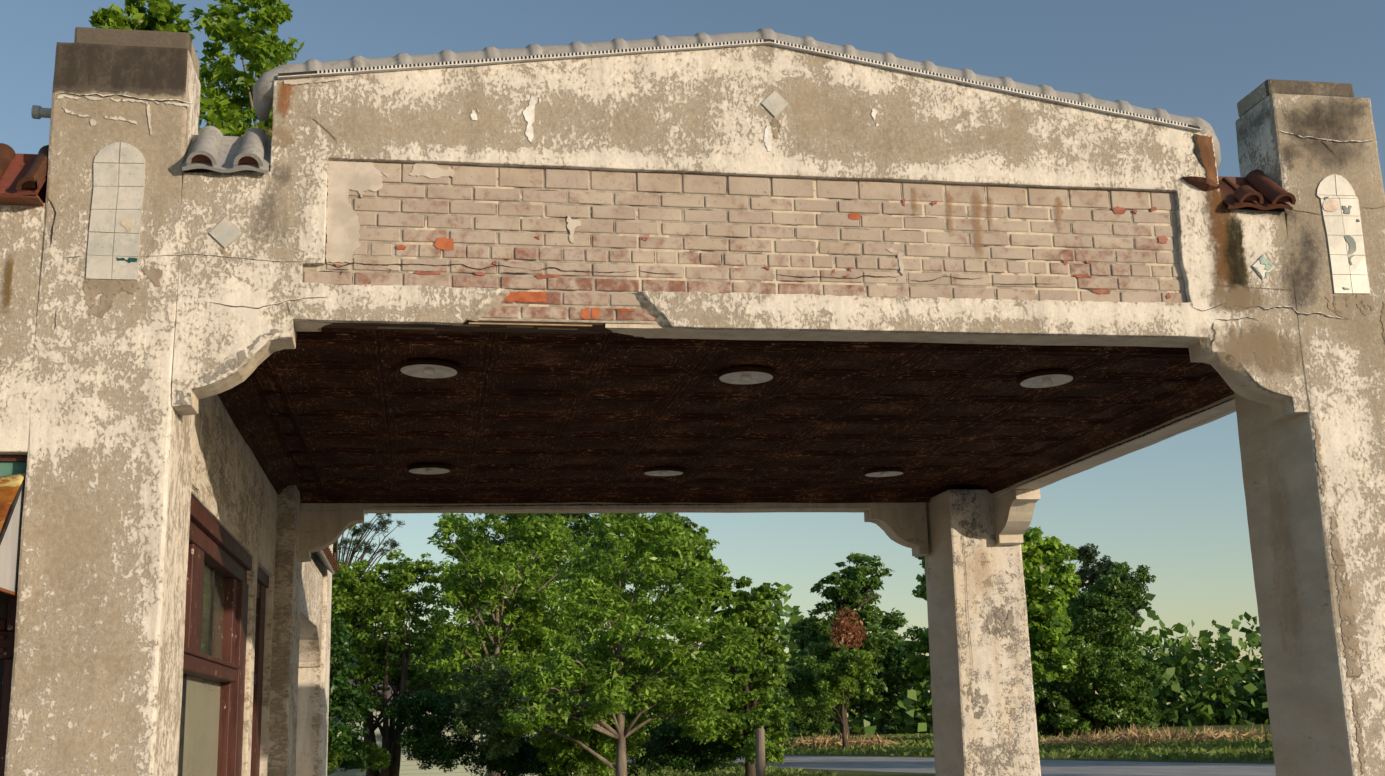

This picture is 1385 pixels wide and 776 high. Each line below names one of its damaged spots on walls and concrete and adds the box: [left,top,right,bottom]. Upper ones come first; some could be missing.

peeling [521,96,541,143]
peeling [763,119,781,155]
crack [1279,130,1374,156]
spalling [1111,206,1157,214]
spalling [434,238,454,250]
flaking render [466,274,670,327]
spalling [1063,260,1111,294]
water stain [1212,217,1266,311]
crack [1192,284,1344,346]
water stain [1203,326,1304,373]
peeling [1313,420,1326,497]
peeling [1331,515,1367,775]